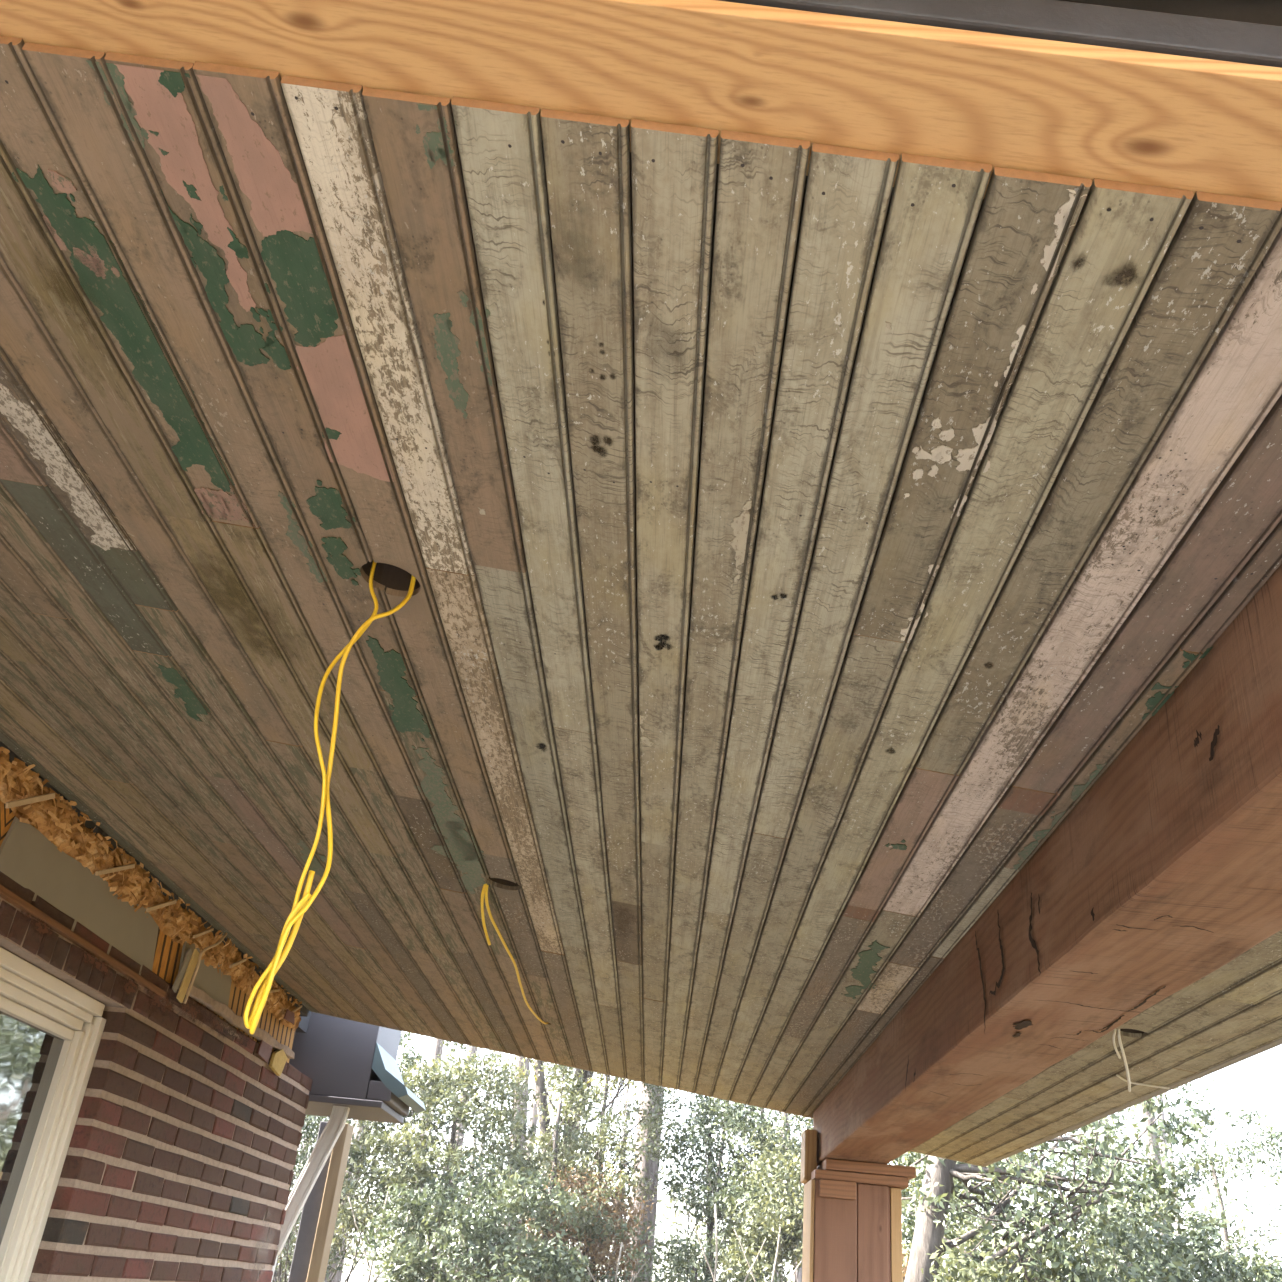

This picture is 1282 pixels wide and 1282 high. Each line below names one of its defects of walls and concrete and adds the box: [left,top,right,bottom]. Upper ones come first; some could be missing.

peeling [416,104,458,169]
peeling [0,384,137,551]
peeling [12,165,256,529]
peeling [86,60,396,482]
peeling [278,480,361,586]
peeling [904,324,1035,518]
peeling [900,590,928,652]
peeling [366,636,486,894]
peeling [841,940,890,999]